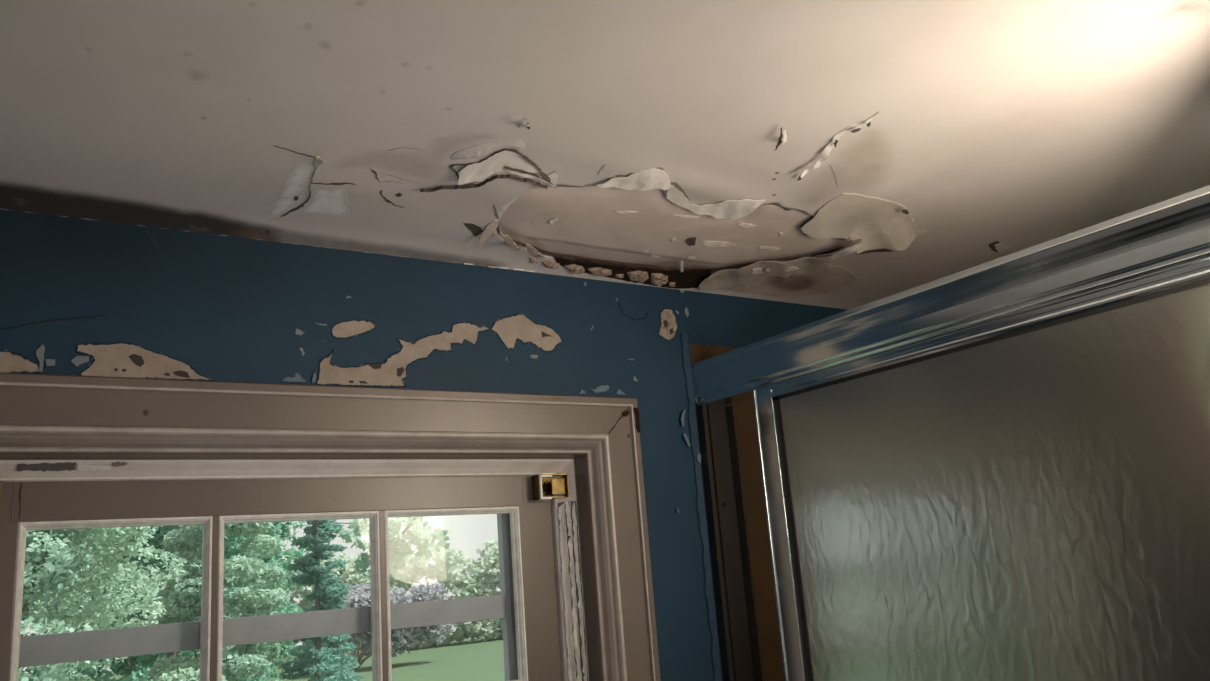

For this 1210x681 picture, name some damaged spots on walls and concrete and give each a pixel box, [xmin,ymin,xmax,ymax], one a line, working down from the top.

flaking render [464,165,862,342]
peeling [0,344,55,374]
peeling [71,342,213,381]
peeling [295,313,562,388]